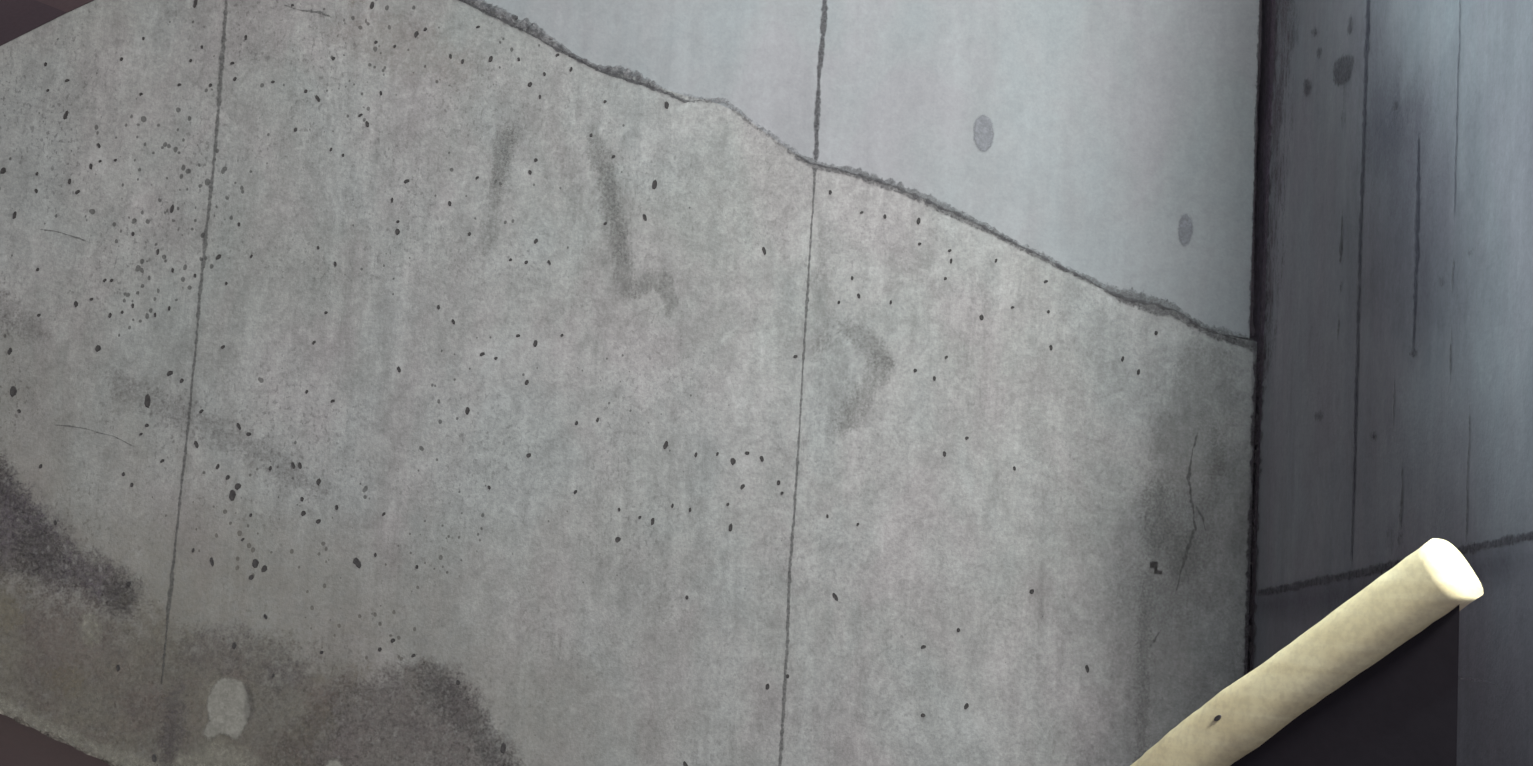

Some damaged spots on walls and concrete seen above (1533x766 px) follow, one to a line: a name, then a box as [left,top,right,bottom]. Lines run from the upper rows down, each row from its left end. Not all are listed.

leakage [0,456,141,610]
leakage [276,661,509,766]